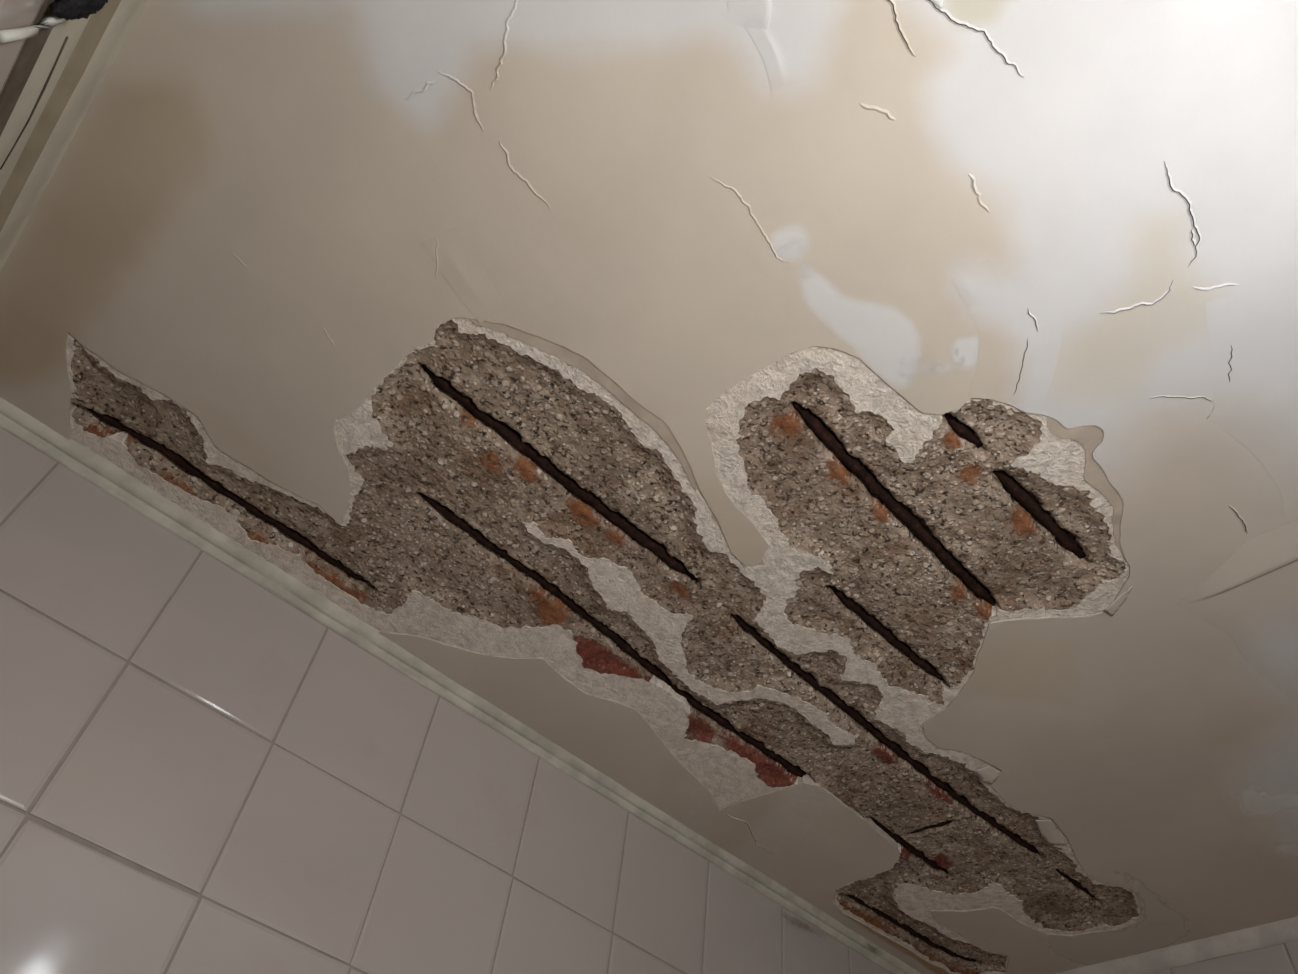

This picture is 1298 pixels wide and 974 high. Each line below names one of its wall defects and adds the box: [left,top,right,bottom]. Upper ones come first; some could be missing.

crack [884,0,1025,78]
crack [404,0,550,210]
crack [710,176,789,263]
crack [1100,161,1240,314]
rust [826,459,850,485]
rust [567,497,624,544]
rust [1011,502,1035,536]
rust [530,586,570,625]
spalling [66,318,1141,974]
rust [574,637,640,678]
rust [687,716,798,787]